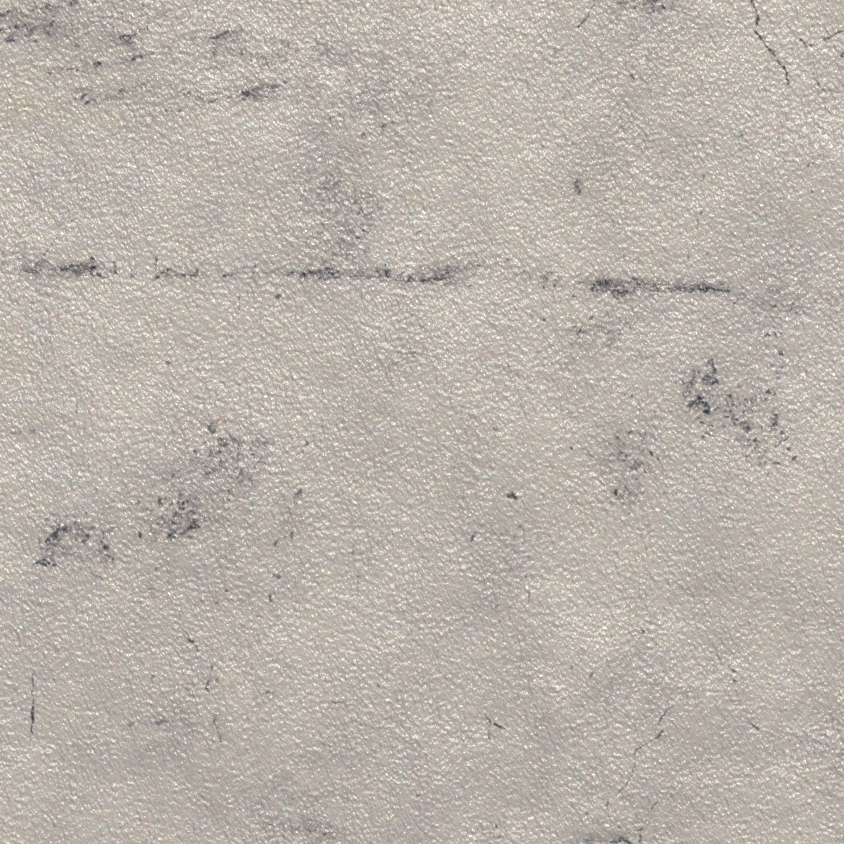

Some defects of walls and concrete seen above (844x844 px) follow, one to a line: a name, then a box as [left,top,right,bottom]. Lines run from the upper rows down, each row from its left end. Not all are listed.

crack [751,0,789,85]